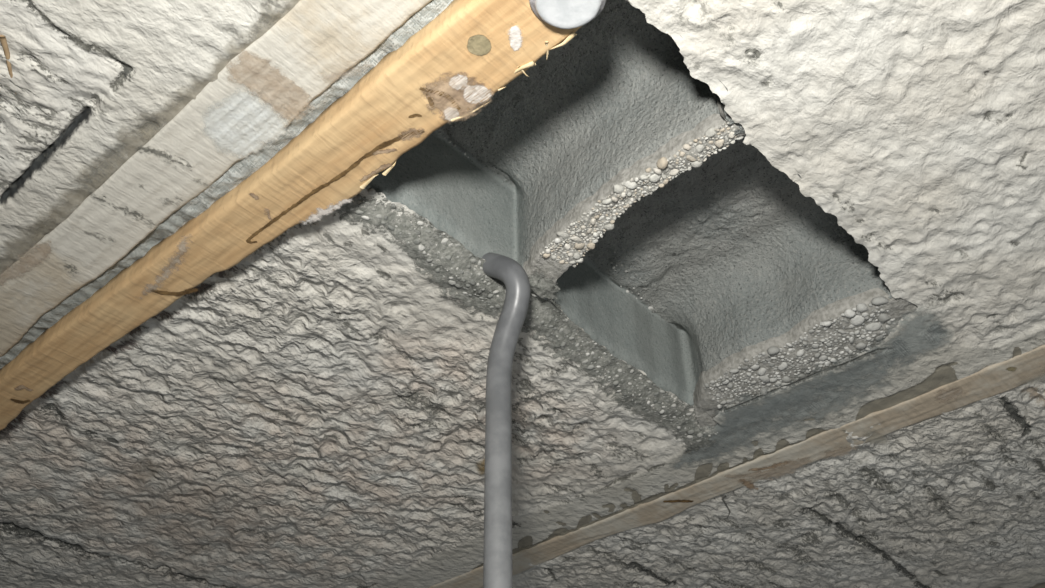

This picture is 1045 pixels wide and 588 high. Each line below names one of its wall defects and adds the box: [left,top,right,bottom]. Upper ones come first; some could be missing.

crack [0,0,300,275]
spalling [540,122,744,267]
crack [102,220,318,354]
crack [0,380,68,439]